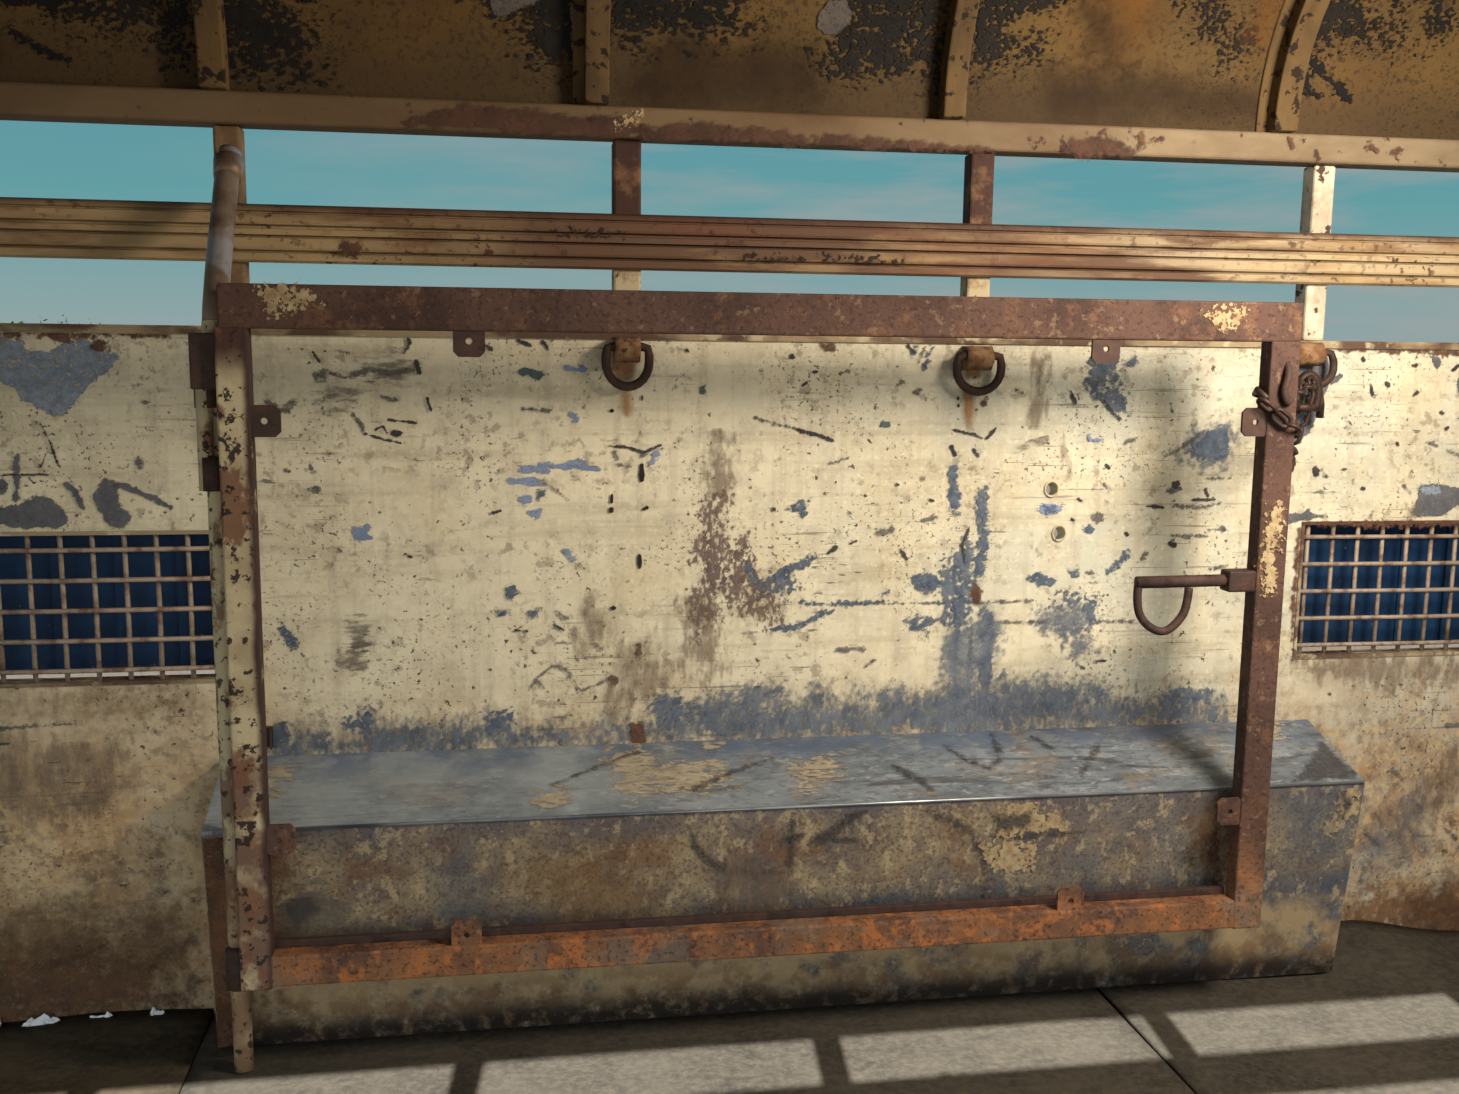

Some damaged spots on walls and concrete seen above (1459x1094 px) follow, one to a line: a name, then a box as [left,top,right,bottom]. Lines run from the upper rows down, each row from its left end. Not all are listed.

water stain [1303,55,1354,105]
rust [404,102,994,155]
rust [1062,136,1136,161]
peeling [0,338,119,416]
peeling [0,452,173,530]
peeling [921,427,997,522]
peeling [1036,497,1105,534]
spalling [743,532,1149,642]